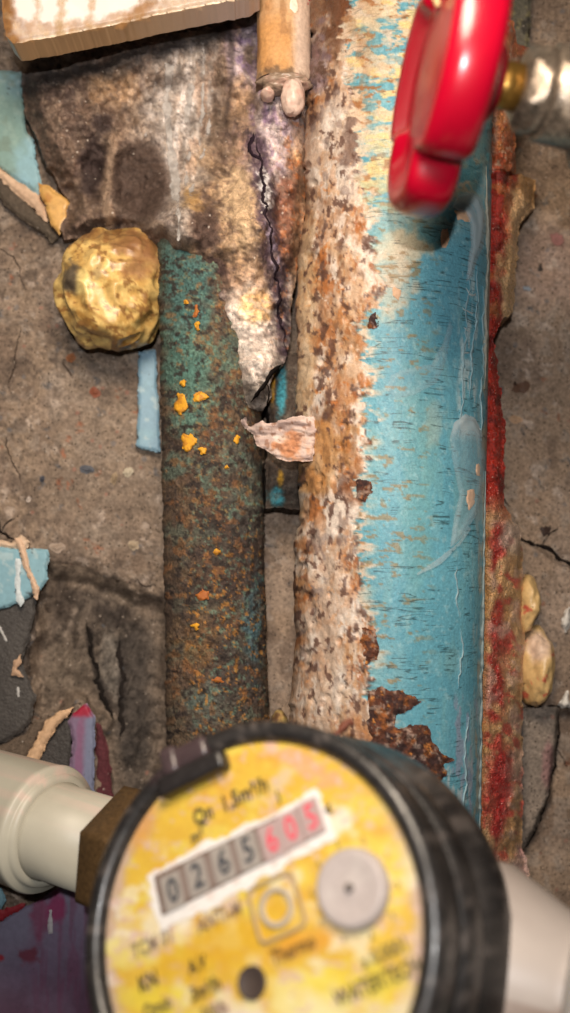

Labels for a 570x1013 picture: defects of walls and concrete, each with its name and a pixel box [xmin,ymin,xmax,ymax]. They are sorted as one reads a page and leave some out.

peeling [0,70,70,244]
water stain [155,49,213,241]
crack [247,133,288,405]
peeling [454,210,472,222]
peeling [483,166,491,389]
crack [521,528,570,566]
spalling [0,535,167,797]
corrosion [334,686,454,780]
peeling [466,464,486,827]
crack [522,705,570,851]